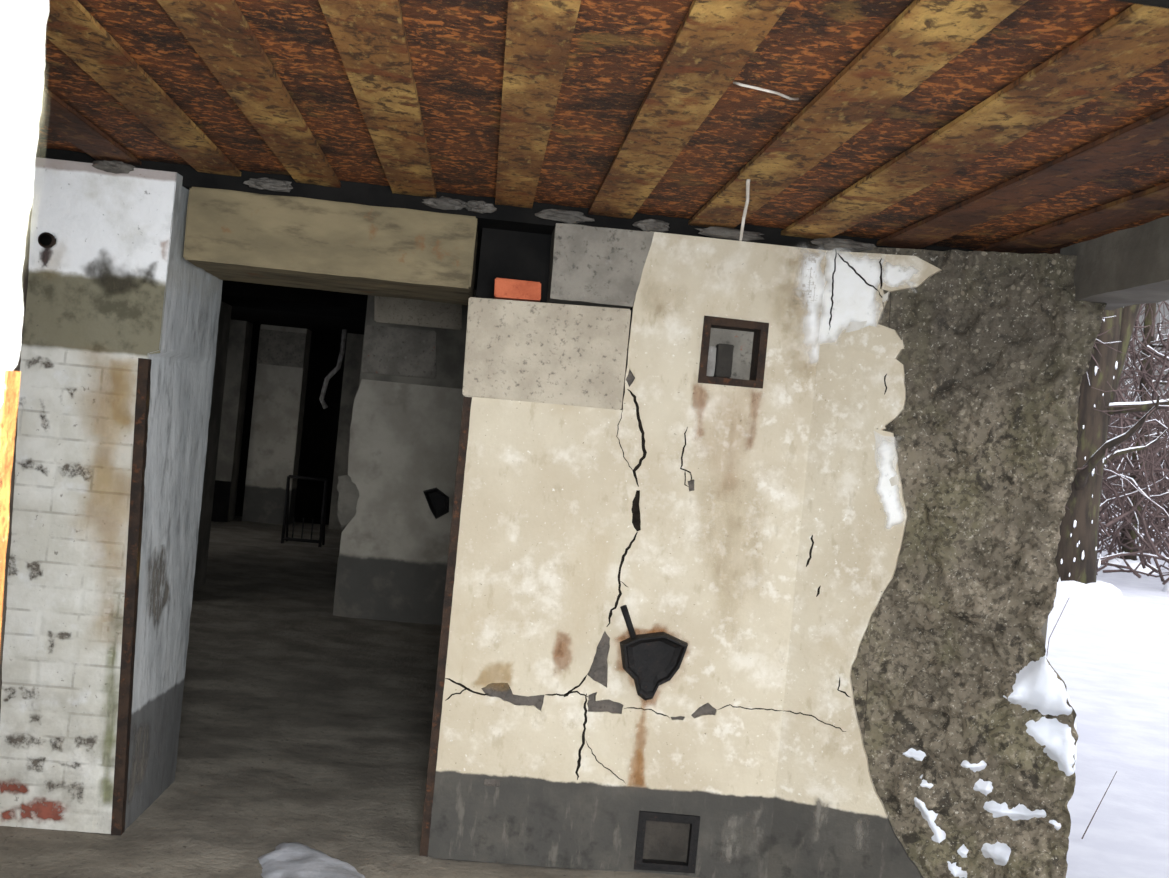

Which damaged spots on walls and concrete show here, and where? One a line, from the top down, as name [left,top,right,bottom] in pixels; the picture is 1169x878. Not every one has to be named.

damp [87,260,153,293]
crack [616,389,647,487]
crack [680,427,692,487]
crack [606,532,638,627]
crack [806,535,821,597]
crack [445,678,488,701]
crack [545,675,625,783]
crack [624,707,667,716]
crack [718,704,846,732]